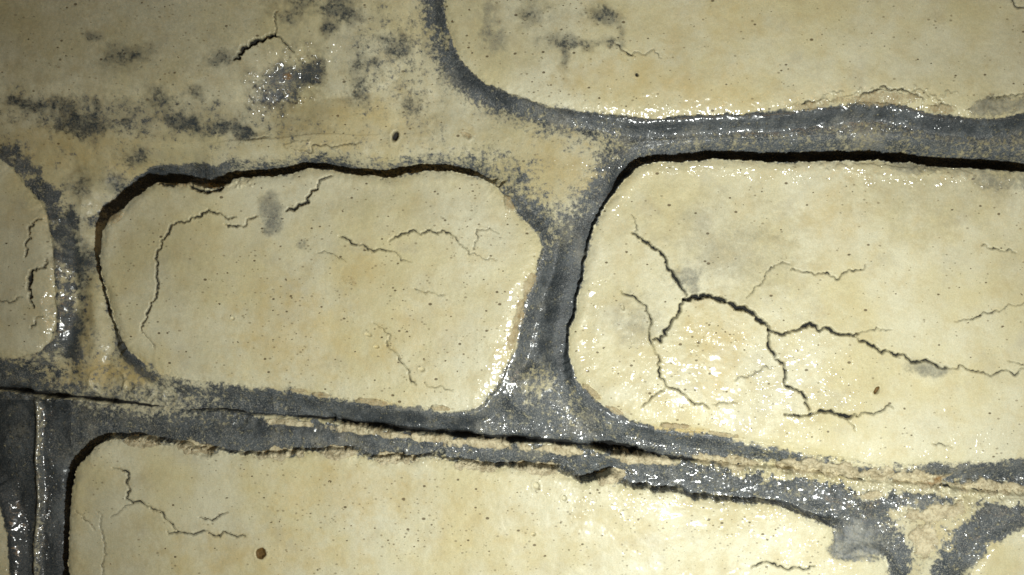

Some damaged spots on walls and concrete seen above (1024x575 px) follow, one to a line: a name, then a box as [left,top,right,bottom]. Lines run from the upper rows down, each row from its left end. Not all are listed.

water stain [287,0,355,32]
crack [235,16,293,60]
water stain [253,60,325,106]
water stain [9,96,104,139]
water stain [164,114,255,139]
crack [626,228,1023,426]
crack [0,386,159,407]
spalling [175,439,219,456]
crack [298,415,587,446]
spalling [266,418,677,486]
spalling [692,452,760,471]
spalling [775,457,1024,562]